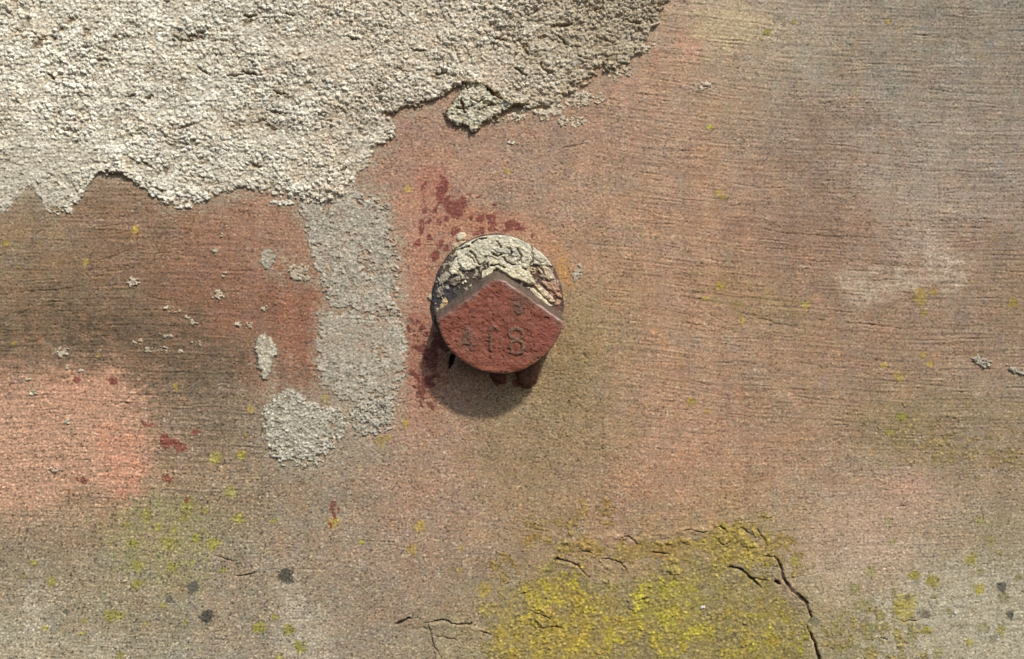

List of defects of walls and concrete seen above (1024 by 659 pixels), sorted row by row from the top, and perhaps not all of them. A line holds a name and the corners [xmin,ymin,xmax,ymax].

flaking render [0,0,671,216]
rust [395,158,581,438]
crack [395,617,491,658]
crack [553,536,668,578]
crack [685,526,821,659]